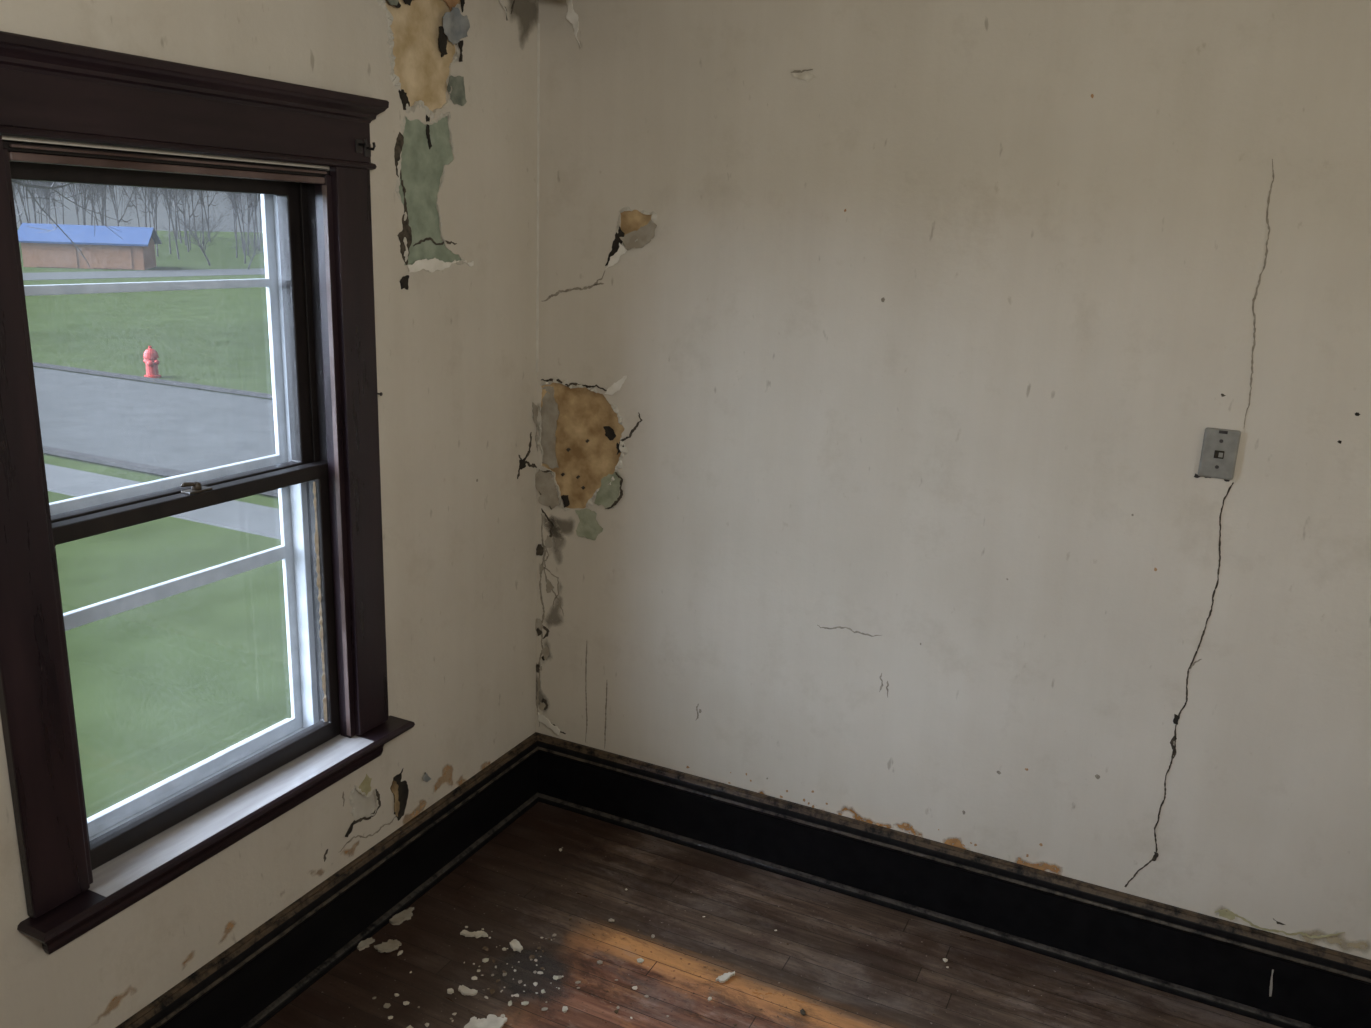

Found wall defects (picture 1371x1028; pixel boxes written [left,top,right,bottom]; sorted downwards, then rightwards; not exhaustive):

flaking render [377,0,474,290]
peeling [605,207,657,268]
crack [1244,159,1274,426]
flaking render [532,376,642,540]
peeling [340,769,431,852]
crack [1124,483,1234,887]